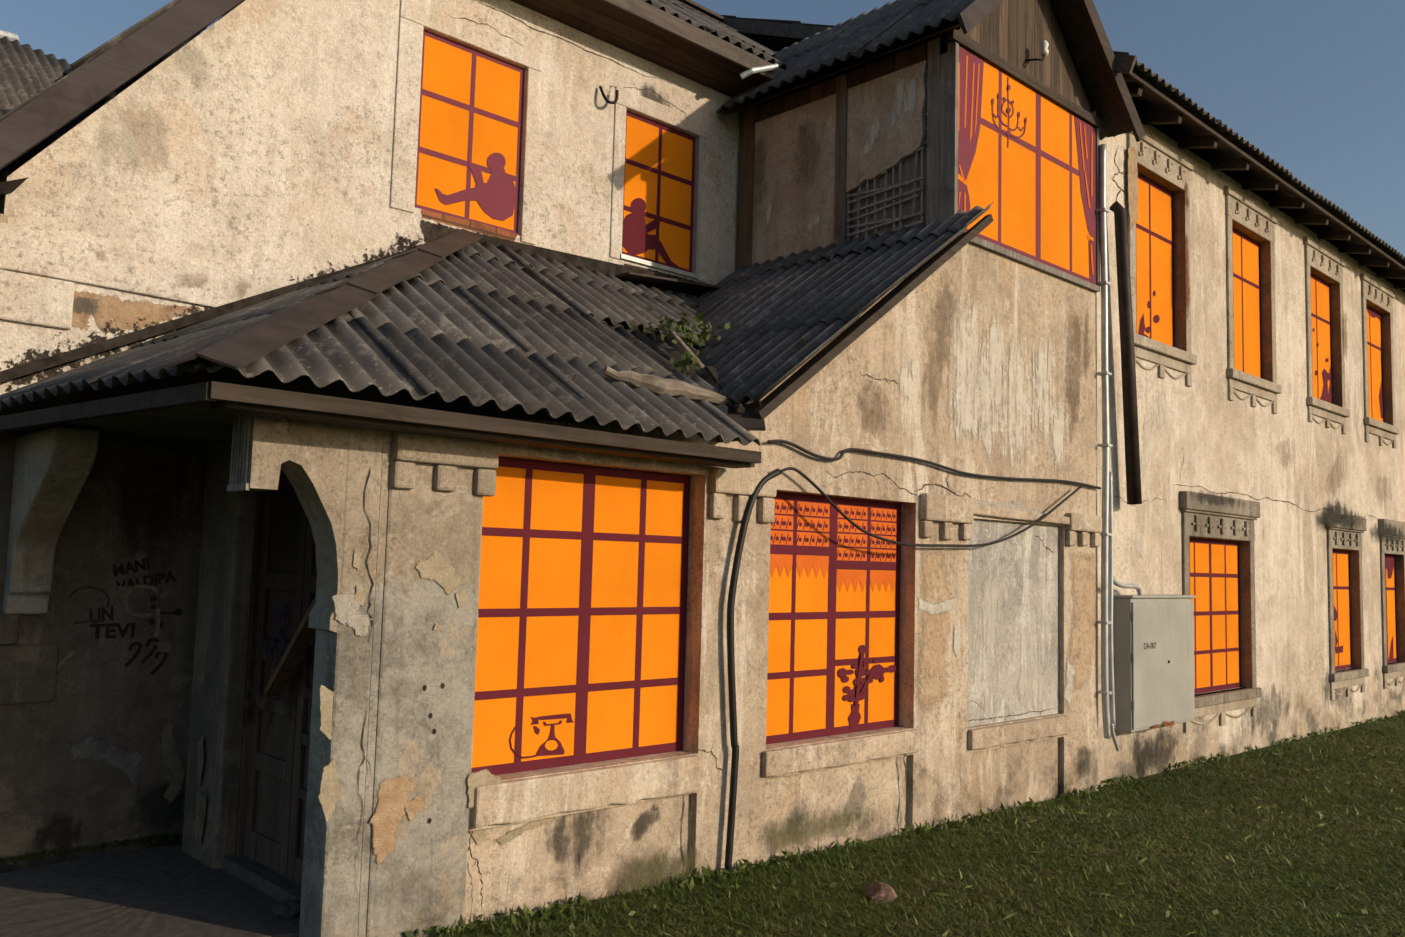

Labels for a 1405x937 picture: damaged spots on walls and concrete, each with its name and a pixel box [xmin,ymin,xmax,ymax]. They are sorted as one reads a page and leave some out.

spalling [0,290,211,392]
water stain [944,293,1069,466]
water stain [1324,499,1363,531]
spalling [332,550,372,636]
peeling [320,684,334,740]
water stain [1134,730,1175,778]
peeling [318,758,342,823]
peeling [370,775,425,869]
water stain [553,811,599,863]
water stain [634,808,659,840]